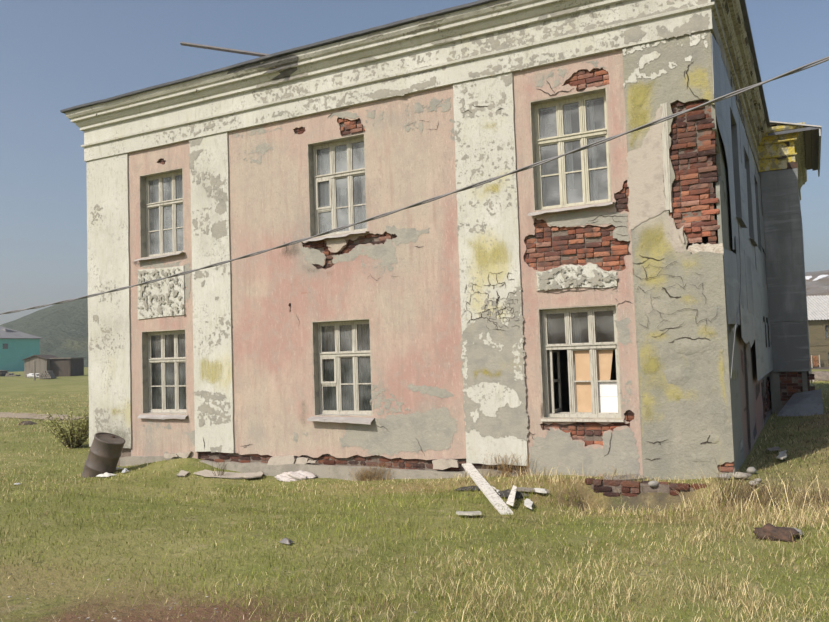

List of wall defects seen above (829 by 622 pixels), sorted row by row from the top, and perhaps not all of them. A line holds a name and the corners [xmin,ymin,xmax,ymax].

peeling [704,0,758,126]
peeling [148,0,684,239]
flaking render [669,100,724,255]
peeling [301,225,430,275]
flaking render [524,181,631,291]
peeling [199,314,232,346]
crack [464,271,519,331]
crack [537,256,718,343]
peeling [184,390,231,445]
peeling [339,286,640,476]
flaking render [761,377,771,419]
flaking render [779,371,815,405]